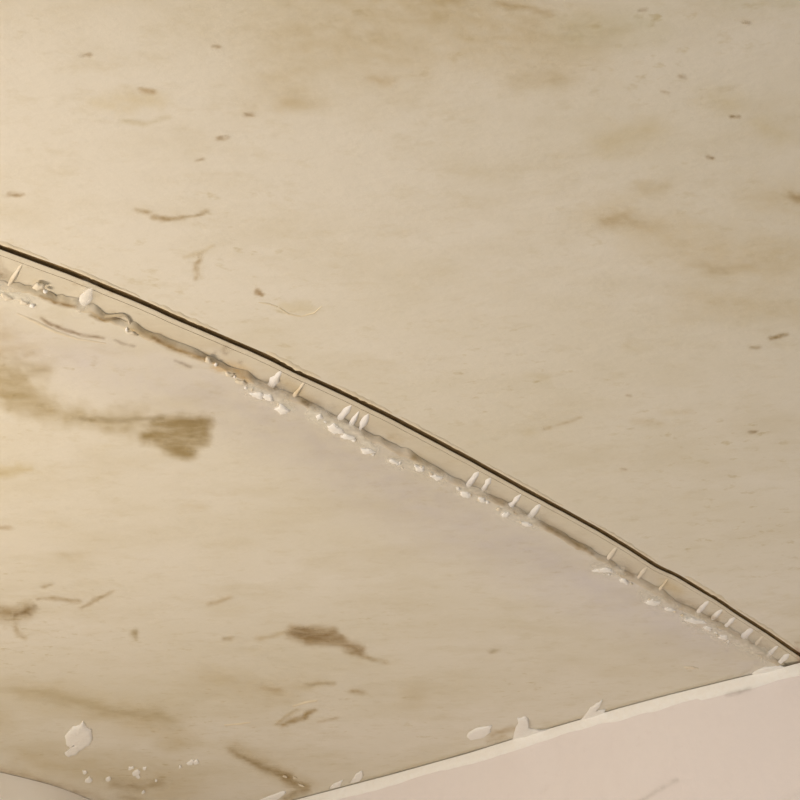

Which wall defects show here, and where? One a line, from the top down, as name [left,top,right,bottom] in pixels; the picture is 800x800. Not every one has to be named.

crack [0,241,800,667]